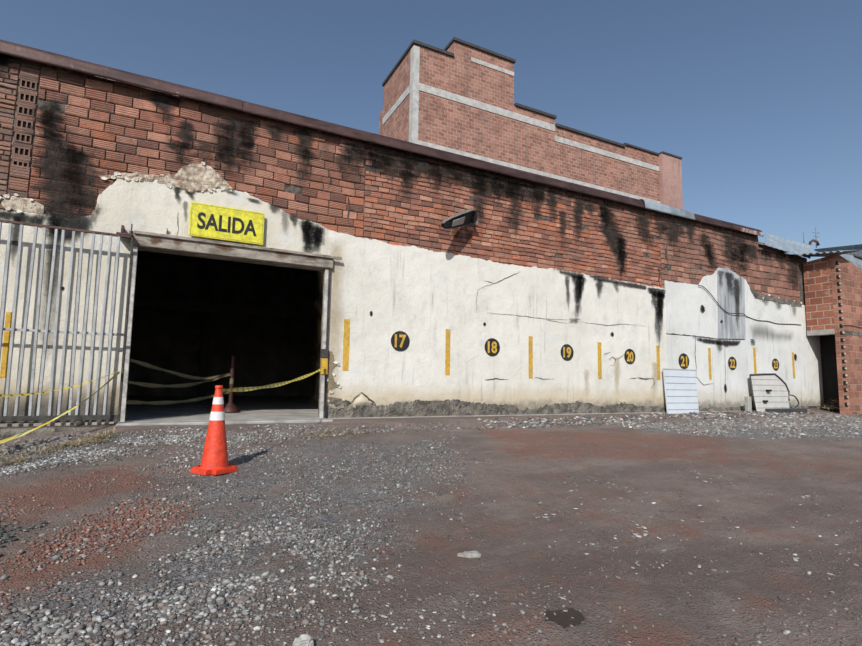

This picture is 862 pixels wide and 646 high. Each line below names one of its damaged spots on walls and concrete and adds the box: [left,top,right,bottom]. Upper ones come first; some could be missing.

water stain [0,53,11,76]
water stain [149,93,179,119]
spalling [101,162,234,193]
water stain [169,119,257,172]
water stain [292,128,313,179]
water stain [0,100,103,313]
water stain [290,213,324,253]
water stain [336,141,665,341]
water stain [637,217,799,323]
spalling [326,351,665,418]